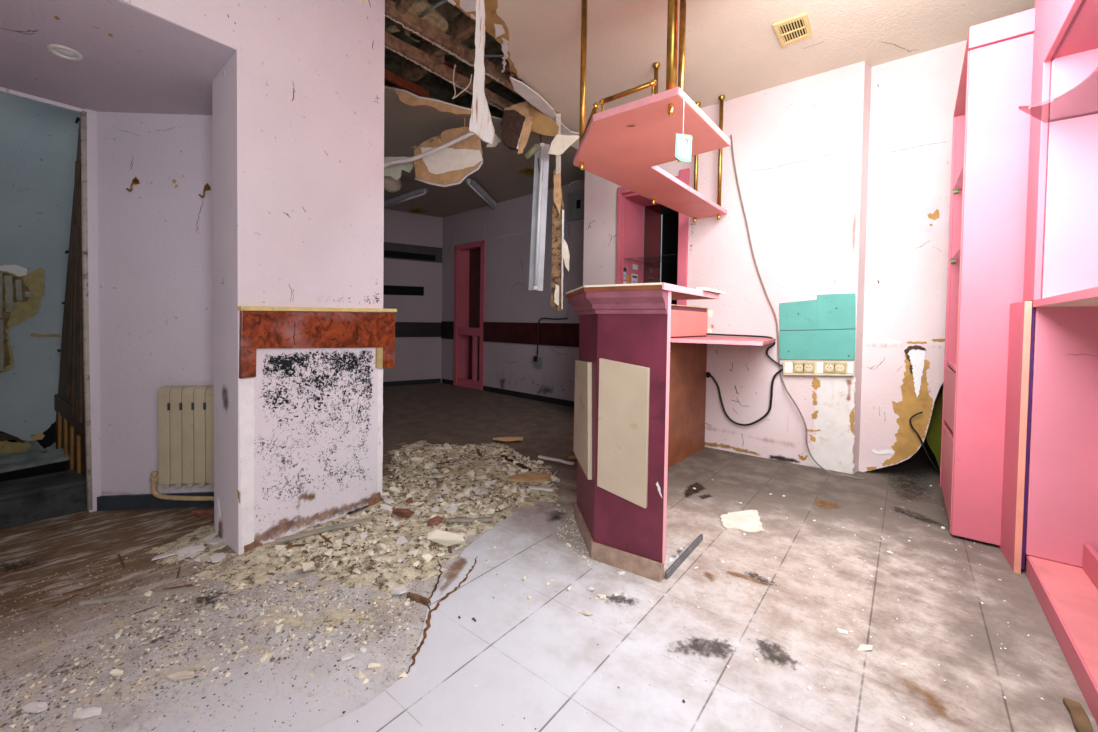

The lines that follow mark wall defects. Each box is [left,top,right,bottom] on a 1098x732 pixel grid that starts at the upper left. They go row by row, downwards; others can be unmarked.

peeling [385,46,473,95]
peeling [385,15,474,67]
spalling [415,161,483,187]
flaking render [0,265,46,374]
leakage [244,350,382,553]
peeling [866,345,933,471]
crack [400,556,478,678]